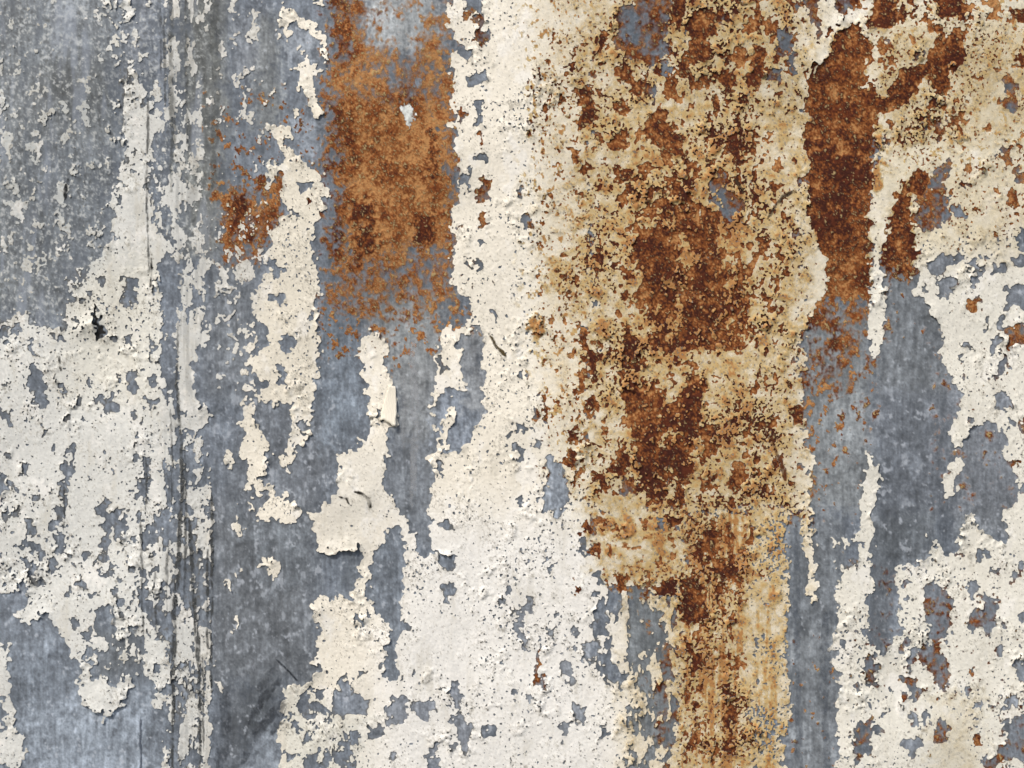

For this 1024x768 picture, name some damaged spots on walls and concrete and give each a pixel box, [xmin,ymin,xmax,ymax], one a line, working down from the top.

spalling [767,0,853,82]
corrosion [202,0,489,371]
corrosion [474,176,492,228]
spalling [869,98,979,171]
spalling [982,140,1024,184]
spalling [1000,79,1020,114]
peeling [0,0,707,768]
corrosion [518,0,1024,768]
peeling [632,158,1024,768]